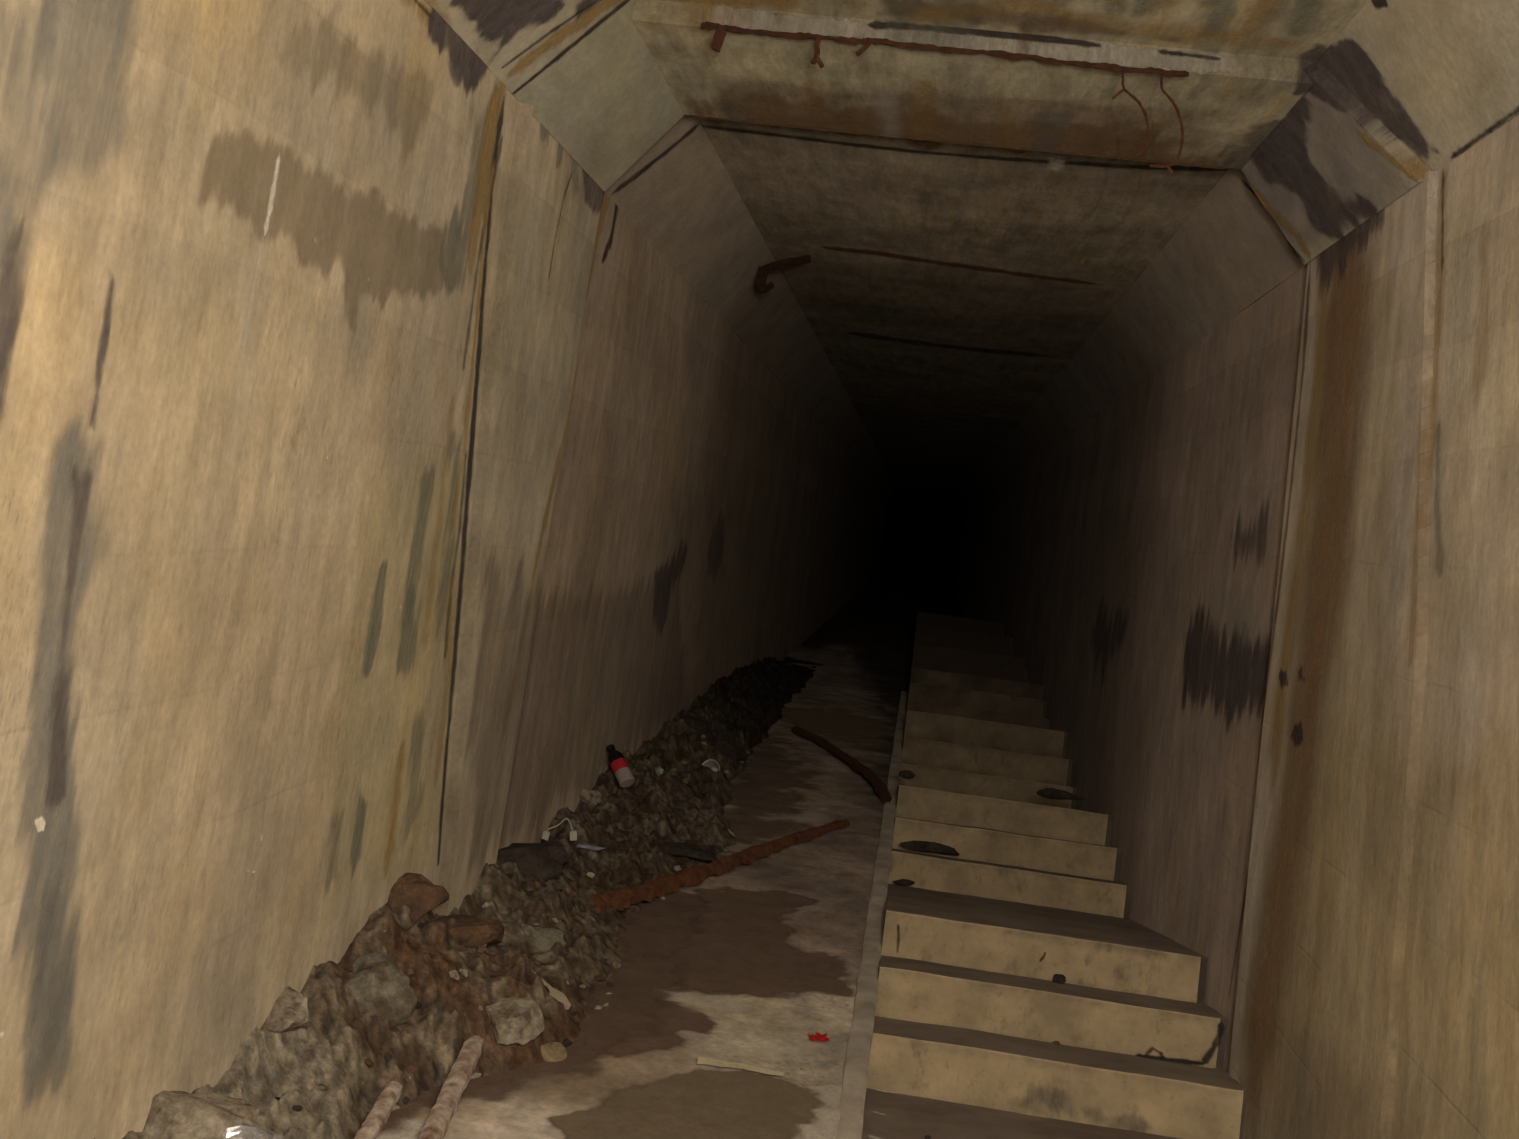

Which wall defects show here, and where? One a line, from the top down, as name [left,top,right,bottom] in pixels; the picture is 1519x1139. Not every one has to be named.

leakage [429,0,601,93]
leakage [0,182,18,409]
leakage [202,134,489,324]
leakage [1231,39,1437,287]
leakage [15,280,113,1096]
leakage [720,708,896,858]
leakage [461,887,853,1101]
leakage [374,1085,443,1139]
leakage [549,1069,823,1139]